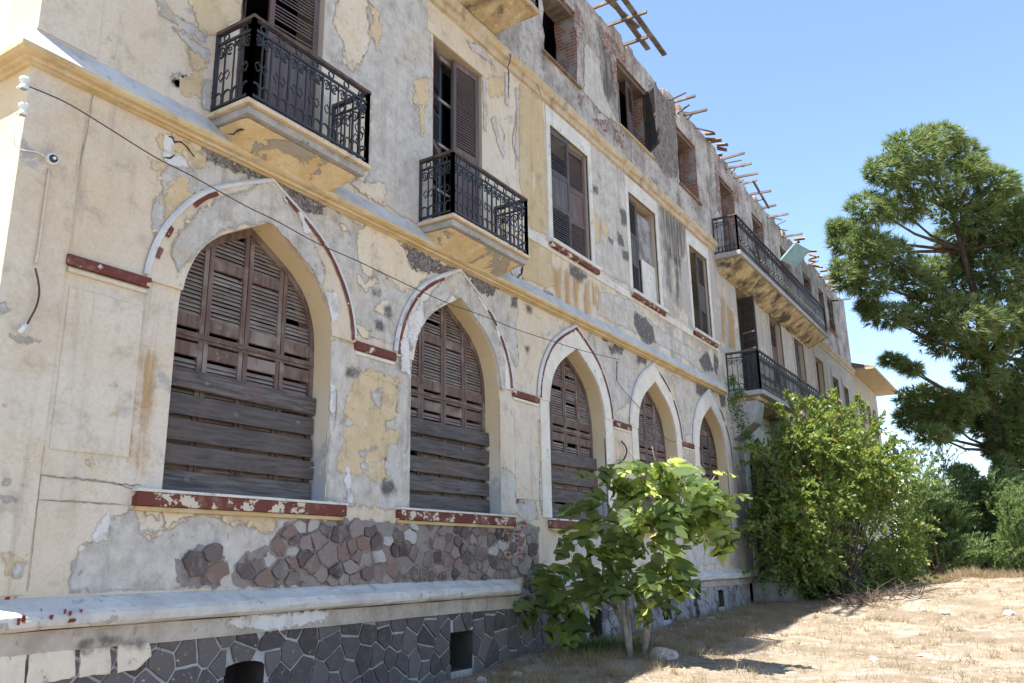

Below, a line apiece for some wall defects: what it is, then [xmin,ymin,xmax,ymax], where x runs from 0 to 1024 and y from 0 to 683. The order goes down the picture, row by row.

crack [78,94,94,174]
crack [164,136,195,159]
peeling [156,0,242,110]
flaking render [323,0,433,224]
flaking render [68,133,548,594]
crack [27,449,141,592]